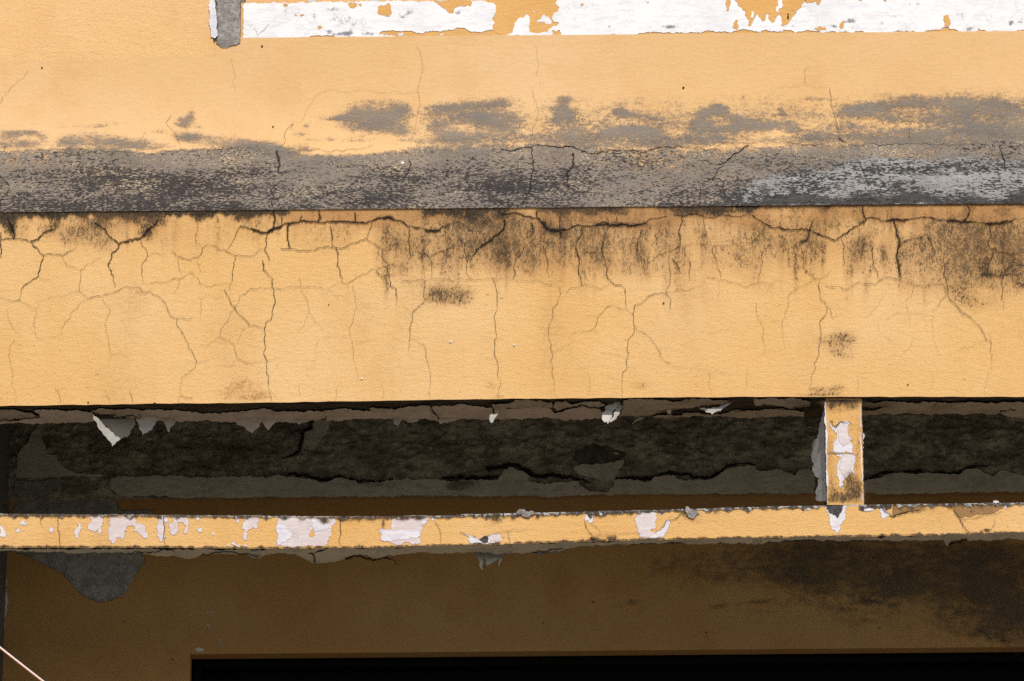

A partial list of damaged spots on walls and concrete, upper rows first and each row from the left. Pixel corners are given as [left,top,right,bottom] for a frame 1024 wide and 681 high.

peeling [377,3,392,17]
peeling [435,0,472,13]
peeling [487,0,559,35]
peeling [725,0,821,30]
water stain [0,92,1024,308]
crack [0,67,1024,483]
peeling [0,397,1024,602]
water stain [0,528,1024,642]